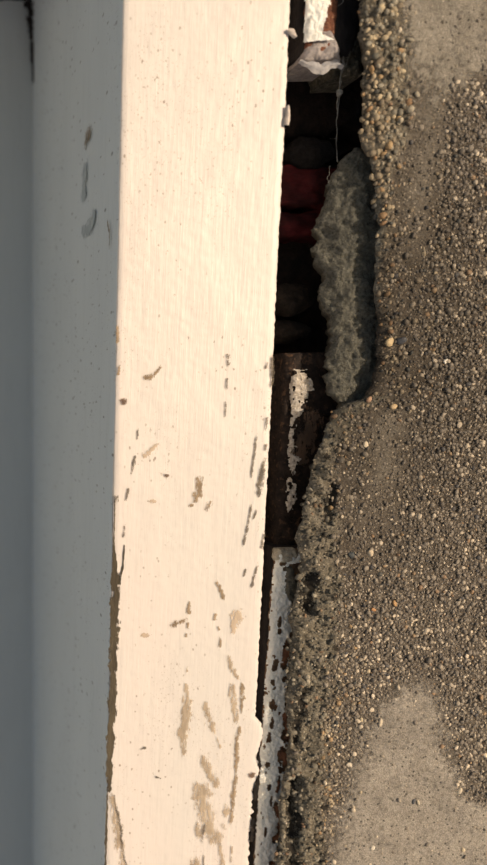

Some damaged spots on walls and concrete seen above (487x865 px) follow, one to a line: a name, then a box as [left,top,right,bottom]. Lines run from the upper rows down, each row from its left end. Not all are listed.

peeling [298,59,344,75]
spalling [264,147,381,545]
peeling [104,499,125,865]